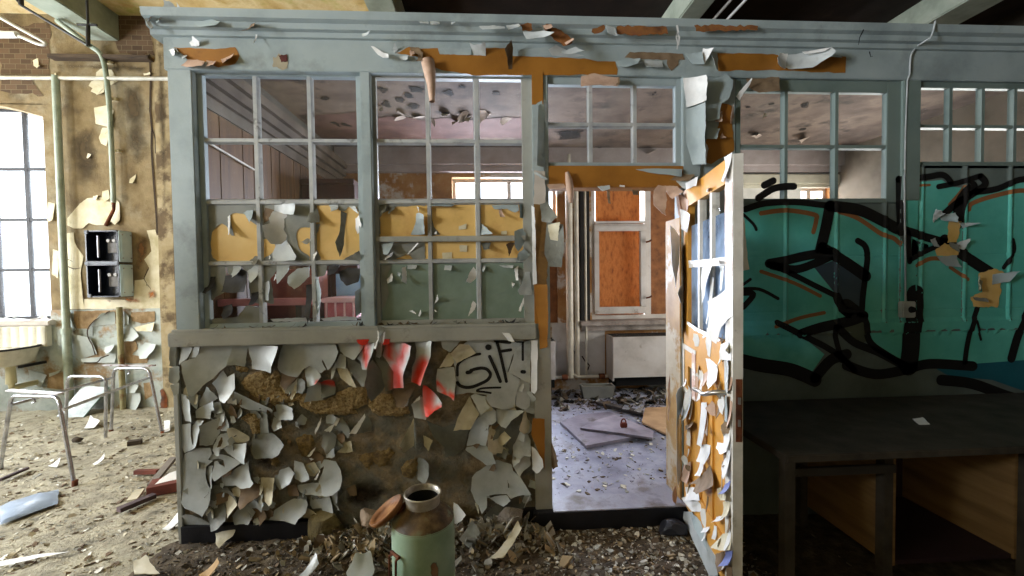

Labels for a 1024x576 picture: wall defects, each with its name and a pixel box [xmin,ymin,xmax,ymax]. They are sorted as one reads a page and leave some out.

peeling [89,69,118,146]
peeling [46,202,55,222]
peeling [931,209,979,267]
peeling [52,190,160,364]
peeling [168,19,846,576]
peeling [971,269,1020,308]
peeling [126,382,152,410]